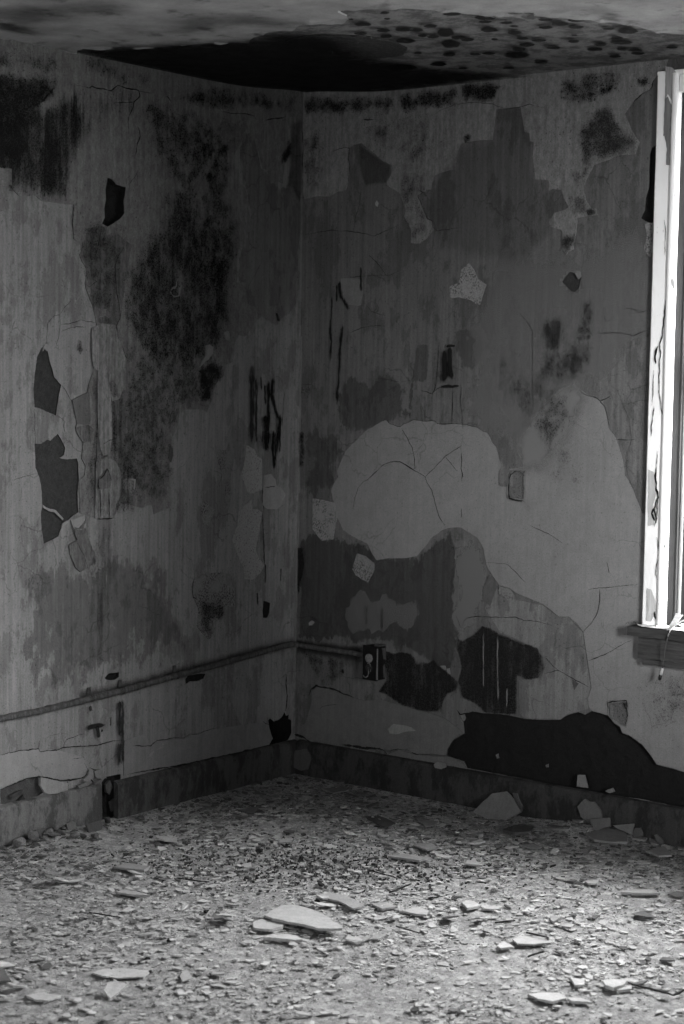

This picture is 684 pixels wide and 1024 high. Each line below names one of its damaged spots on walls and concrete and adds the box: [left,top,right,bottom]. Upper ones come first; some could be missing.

crack [2,727,260,789]
damp [0,11,644,513]
peeling [0,0,684,580]
peeling [0,677,684,1024]
crack [353,350,484,525]
flaking render [306,336,684,807]